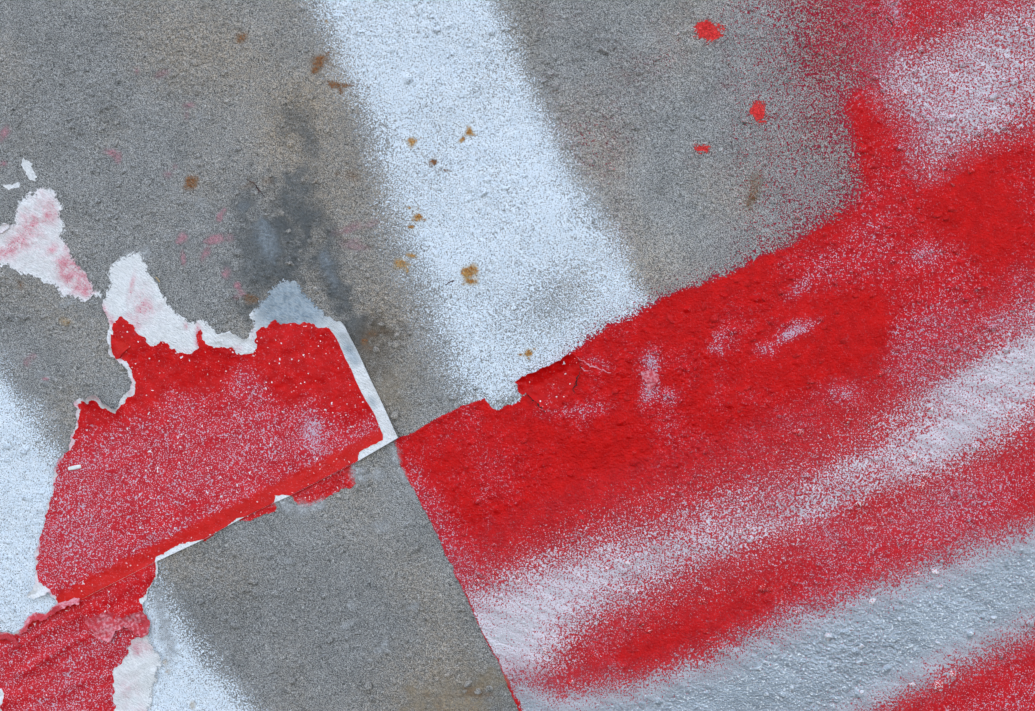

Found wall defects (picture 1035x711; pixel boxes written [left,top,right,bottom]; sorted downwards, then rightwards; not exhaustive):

peeling [3,158,37,190]
peeling [291,463,356,507]
peeling [239,503,277,521]